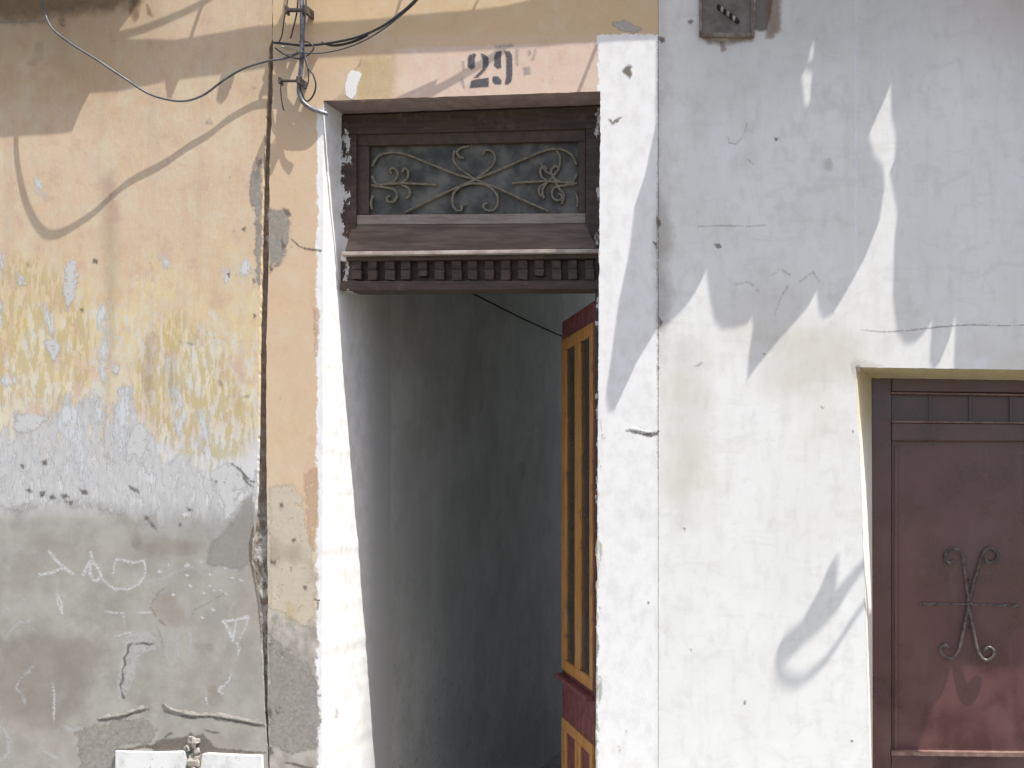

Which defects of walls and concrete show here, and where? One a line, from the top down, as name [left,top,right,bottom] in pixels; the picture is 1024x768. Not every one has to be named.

spalling [224,159,291,285]
peeling [0,255,255,526]
crack [96,44,322,730]
peeling [268,469,318,626]